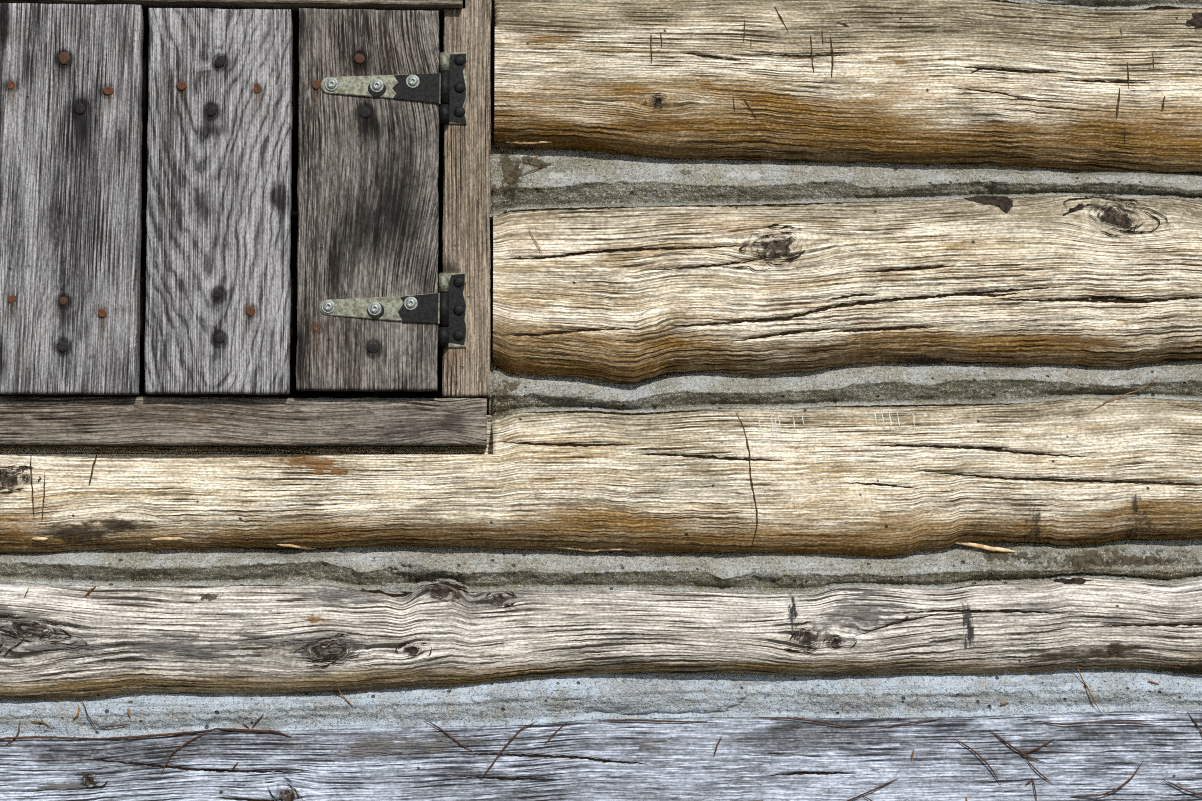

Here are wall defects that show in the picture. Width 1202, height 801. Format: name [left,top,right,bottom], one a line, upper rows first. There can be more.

crack [661,264,1202,341]
corrosion [279,451,352,475]